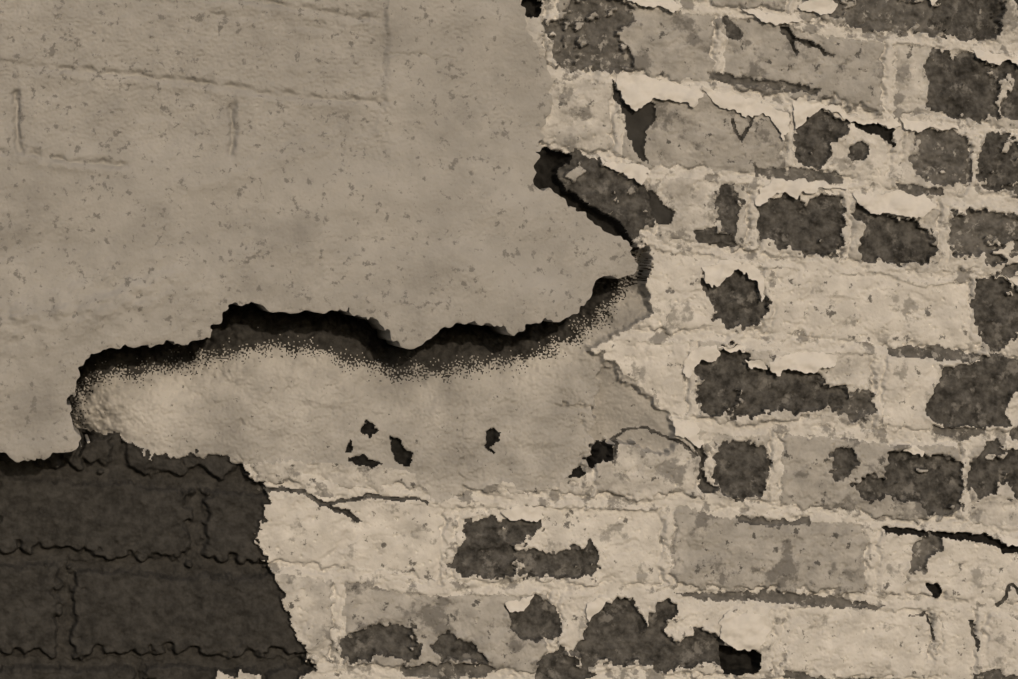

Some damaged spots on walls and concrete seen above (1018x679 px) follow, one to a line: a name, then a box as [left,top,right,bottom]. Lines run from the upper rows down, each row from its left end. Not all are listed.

spalling [682,0,1018,517]
flaking render [0,0,704,679]
crack [257,485,429,523]
spalling [909,531,944,598]
peeling [999,536,1018,546]
spalling [504,593,771,679]